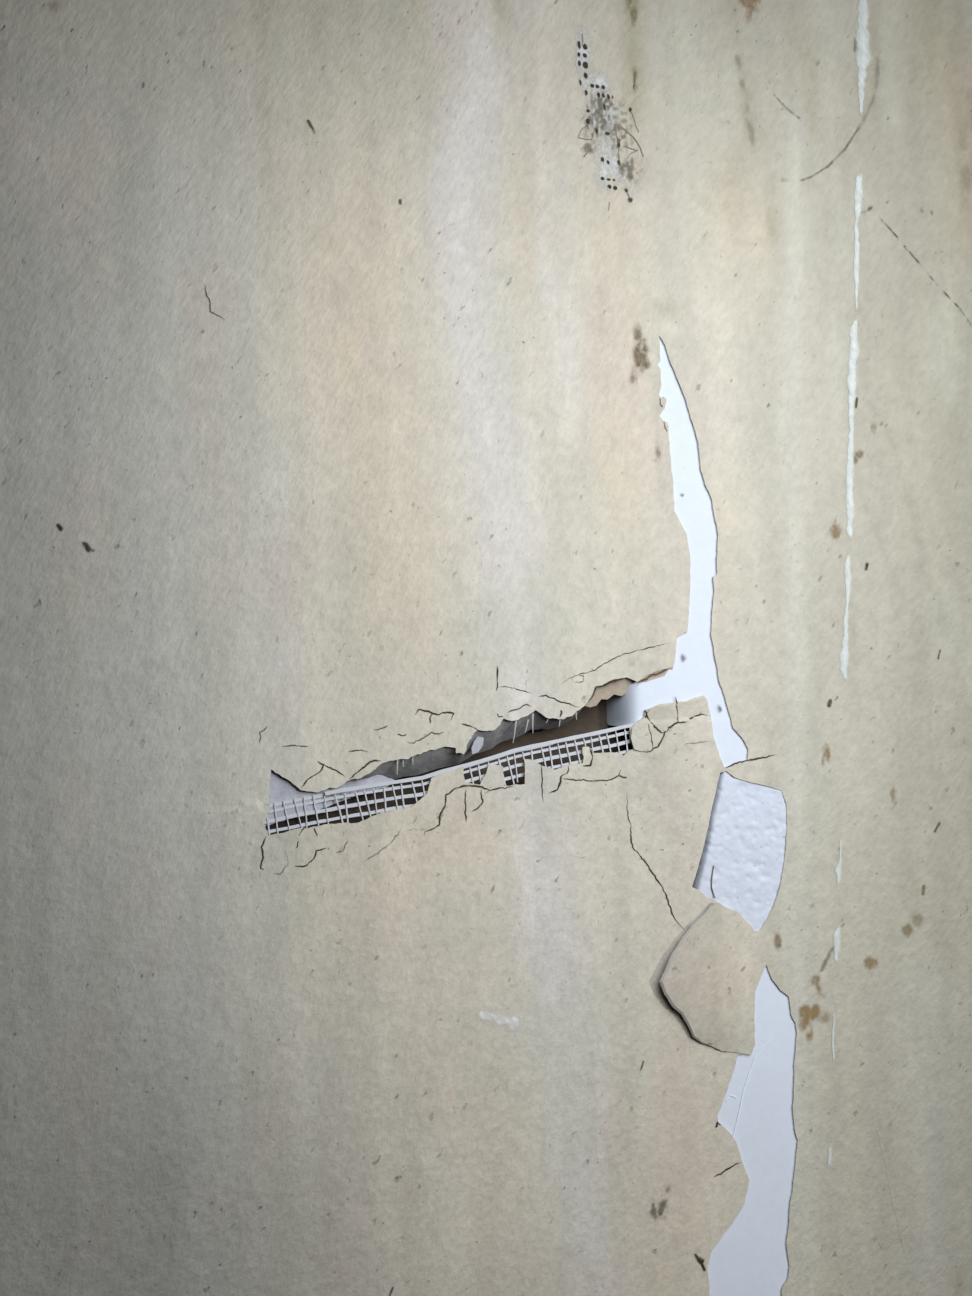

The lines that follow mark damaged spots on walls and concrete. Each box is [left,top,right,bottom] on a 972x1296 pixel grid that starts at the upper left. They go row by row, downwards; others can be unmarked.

crack [259,645,705,927]
peeling [607,337,797,1296]
crack [725,755,773,768]